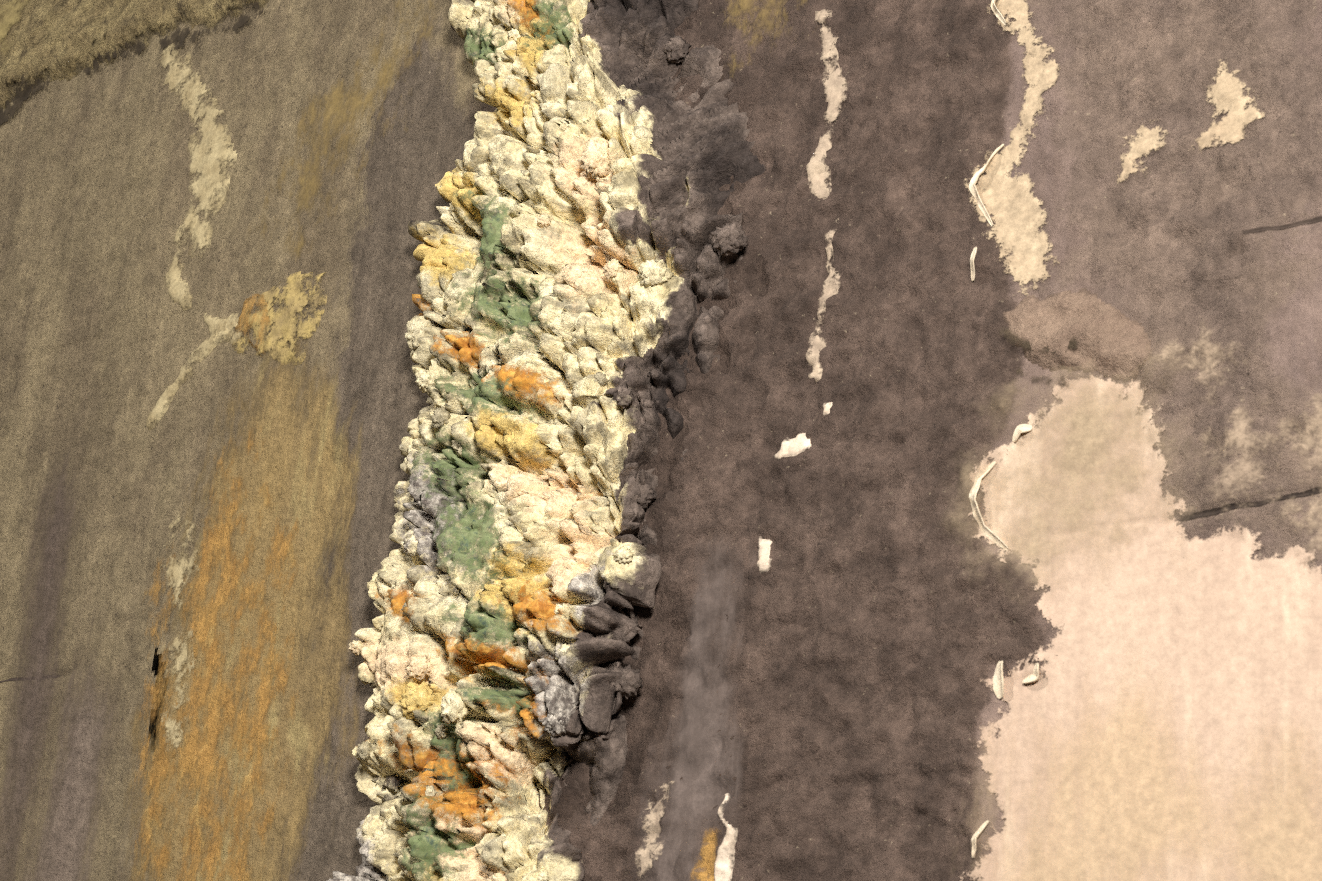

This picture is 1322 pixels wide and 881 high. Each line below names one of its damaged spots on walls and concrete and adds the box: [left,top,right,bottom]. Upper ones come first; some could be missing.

corrosion [131,347,358,881]
water stain [327,0,765,881]
water stain [757,538,772,572]
peeling [960,0,1322,881]
crack [1180,485,1322,520]
crack [1231,216,1322,234]